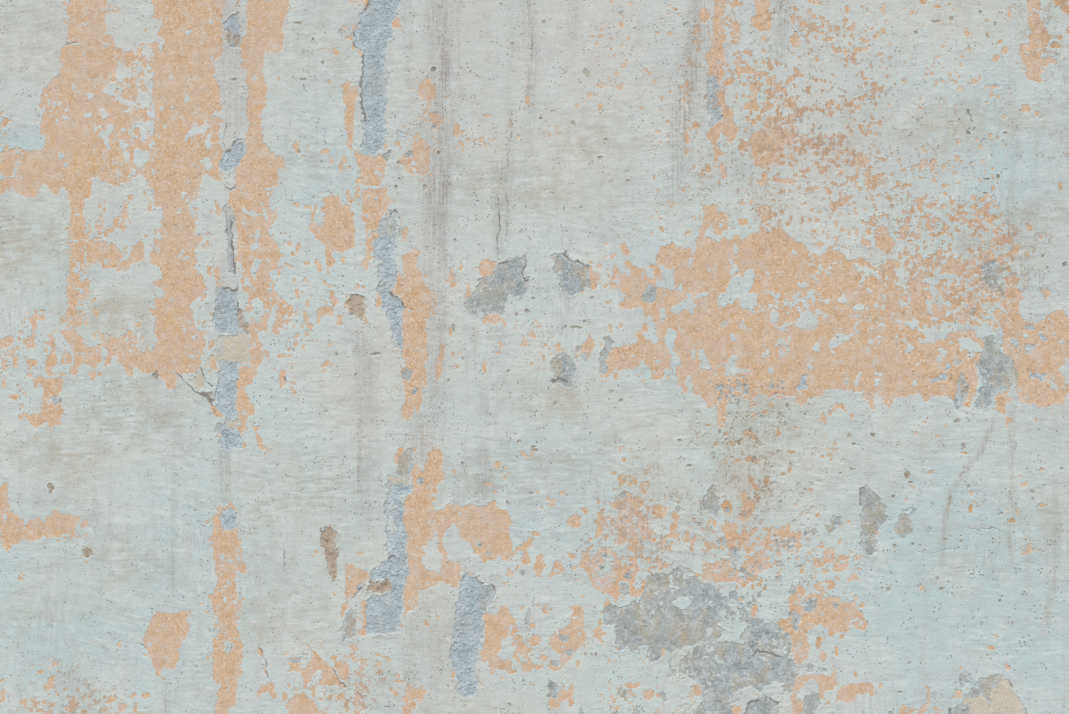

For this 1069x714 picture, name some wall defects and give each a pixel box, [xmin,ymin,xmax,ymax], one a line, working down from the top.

peeling [0,0,500,456]
peeling [403,0,1069,714]
peeling [0,483,98,564]
peeling [0,656,159,714]
peeling [115,489,427,714]